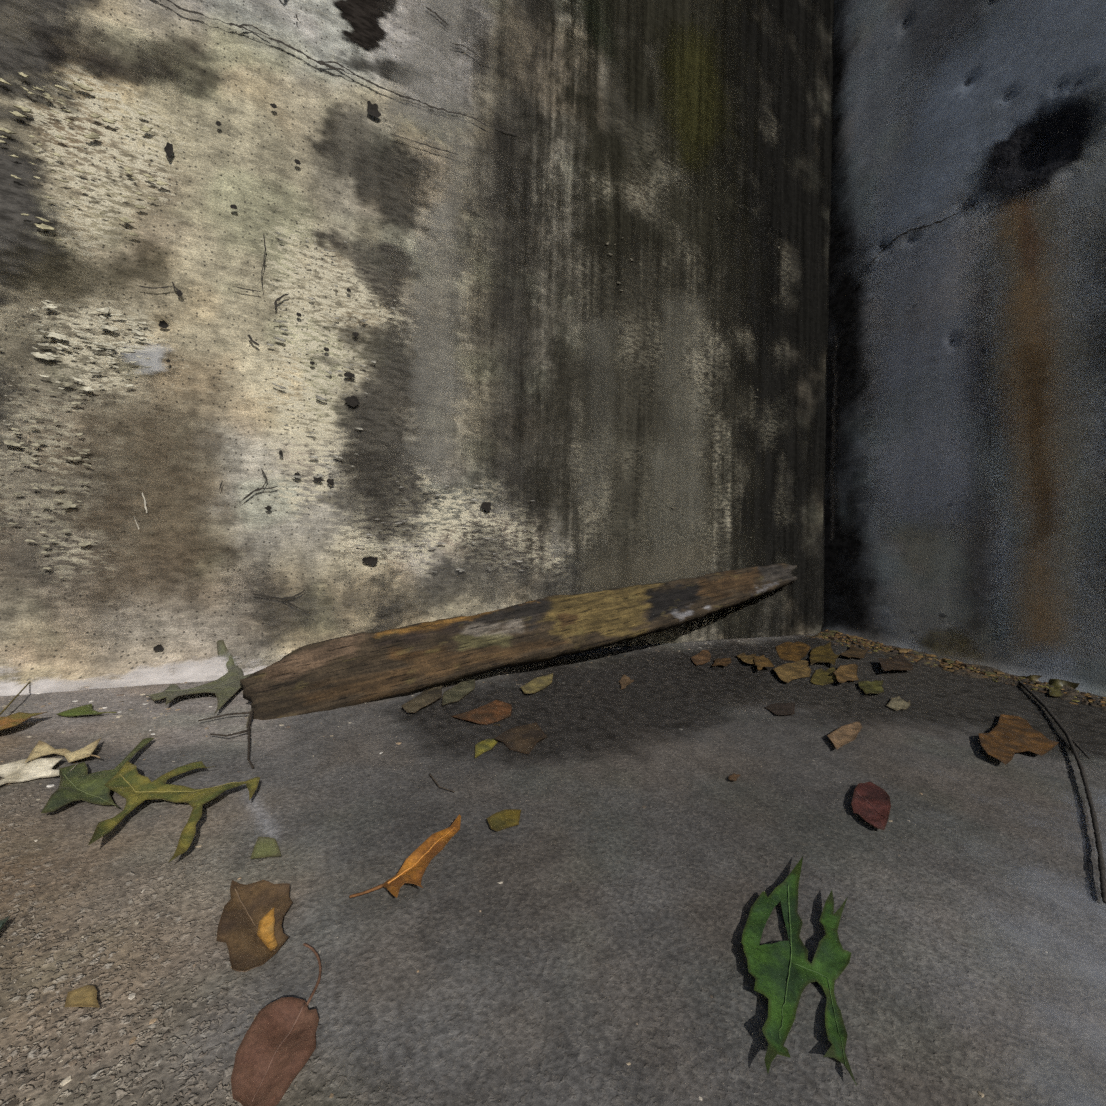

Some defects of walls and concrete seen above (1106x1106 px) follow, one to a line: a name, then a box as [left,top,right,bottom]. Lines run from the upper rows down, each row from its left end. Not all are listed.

water stain [310,108,439,230]
water stain [334,0,431,126]
water stain [896,0,1106,231]
water stain [468,0,762,594]
crack [871,211,962,263]
water stain [314,231,468,526]
water stain [249,585,315,639]
water stain [371,527,511,632]